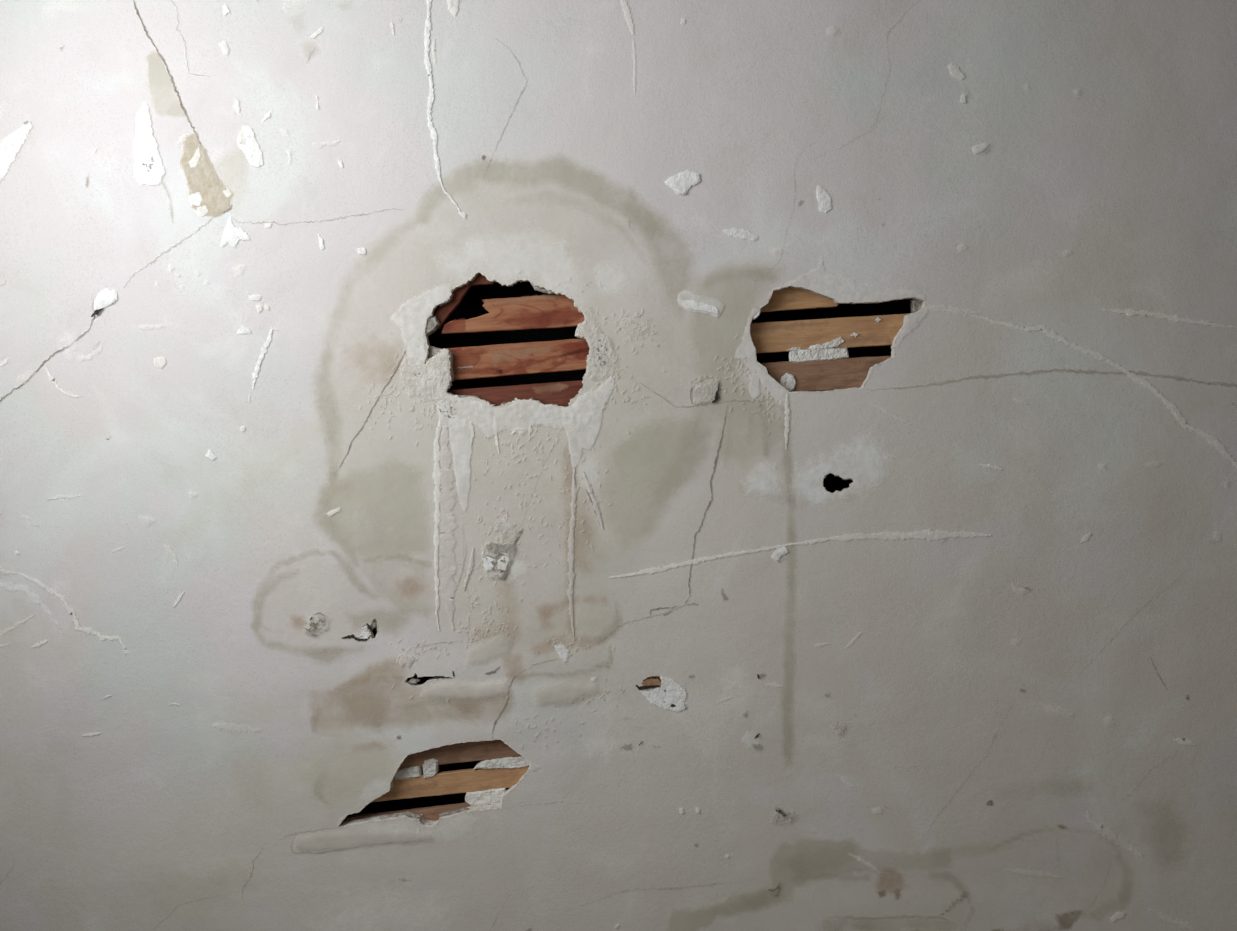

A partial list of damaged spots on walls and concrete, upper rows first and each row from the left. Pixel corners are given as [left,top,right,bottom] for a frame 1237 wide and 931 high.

crack [133,0,201,145]
crack [0,317,95,402]
flaking render [736,259,927,450]
crack [876,369,1237,390]
flaking render [360,271,658,631]
flaking render [796,438,887,504]
flaking render [636,676,687,712]
flaking render [337,739,539,842]